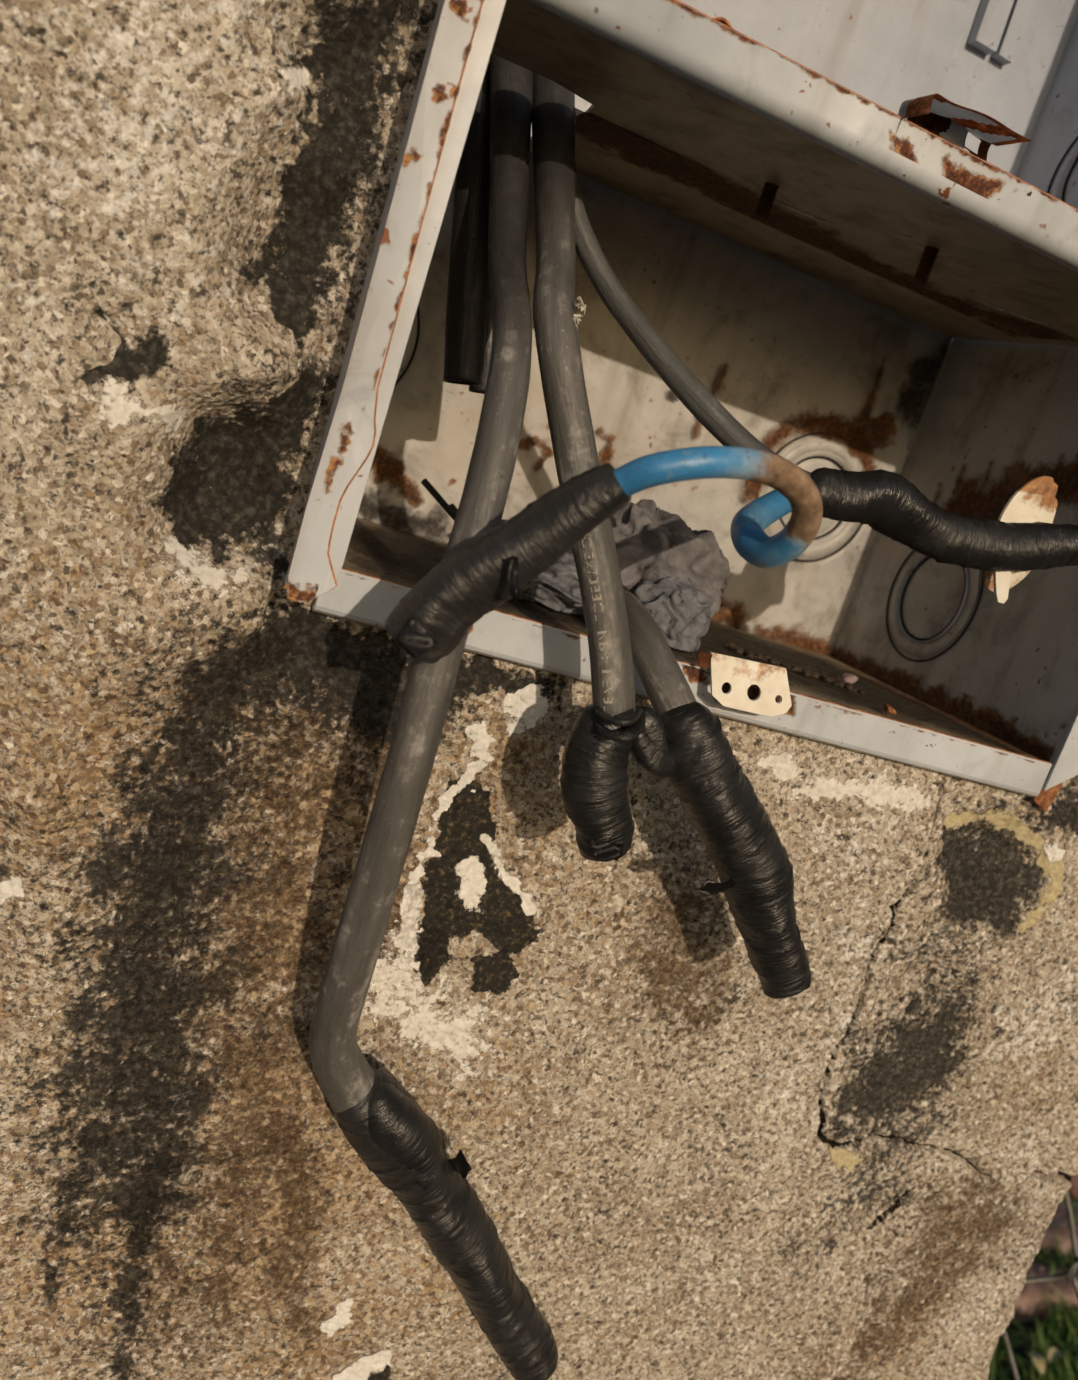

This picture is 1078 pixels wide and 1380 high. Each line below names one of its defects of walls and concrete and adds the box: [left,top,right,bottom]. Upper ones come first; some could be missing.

leakage [2,0,430,1380]
leakage [448,653,578,714]
crack [817,889,987,1177]
leakage [824,966,1008,1147]
crack [867,1183,927,1230]
crack [1033,1170,1074,1183]